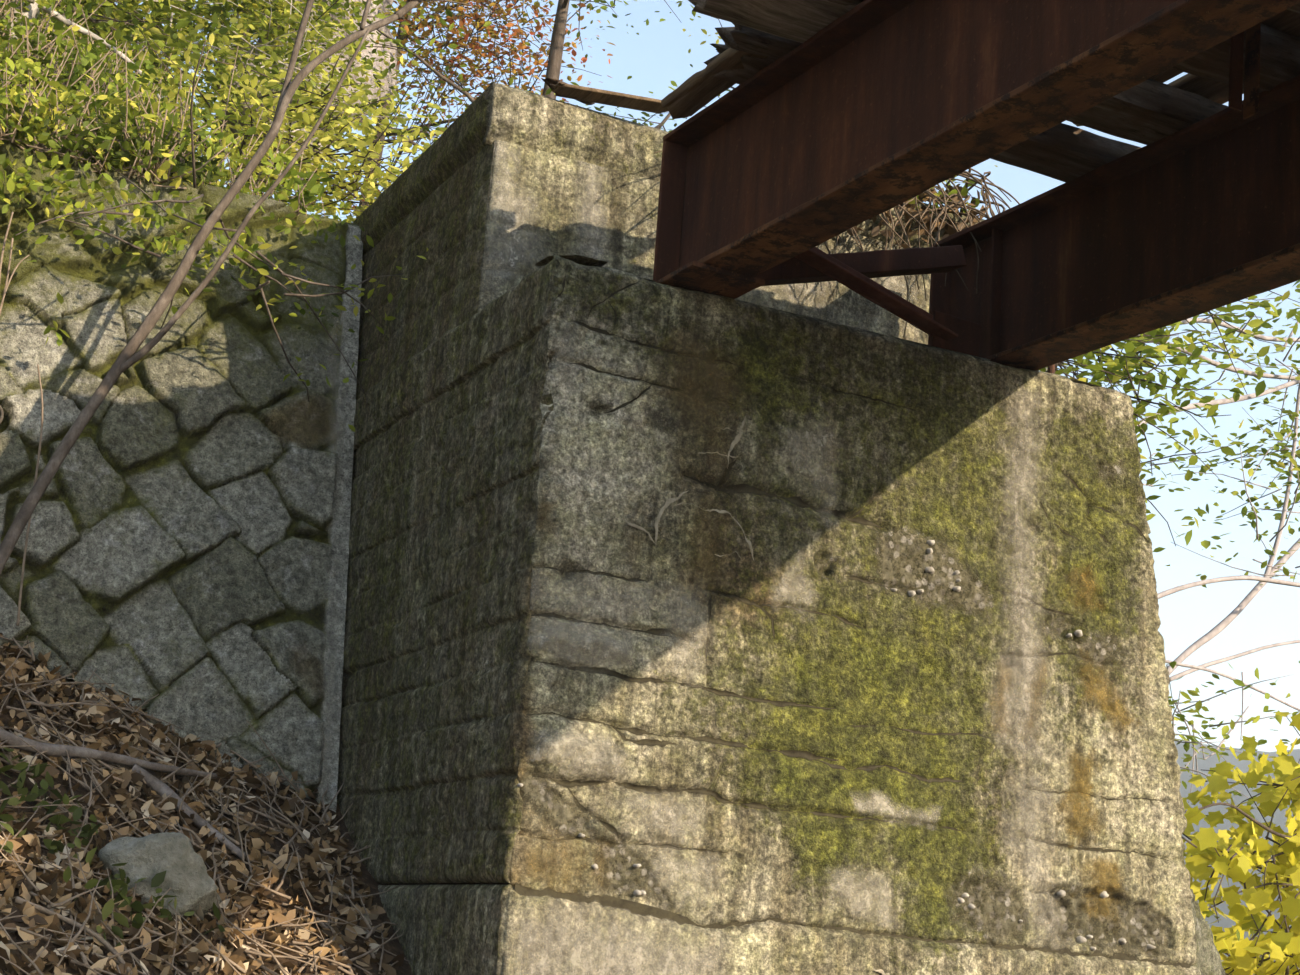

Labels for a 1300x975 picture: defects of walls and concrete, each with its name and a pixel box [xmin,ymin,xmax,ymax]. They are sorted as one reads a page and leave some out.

crack [533,566,650,583]
crack [531,590,1005,741]
crack [845,576,917,593]
water stain [1003,554,1038,748]
crack [1038,473,1148,545]
crack [518,712,966,853]